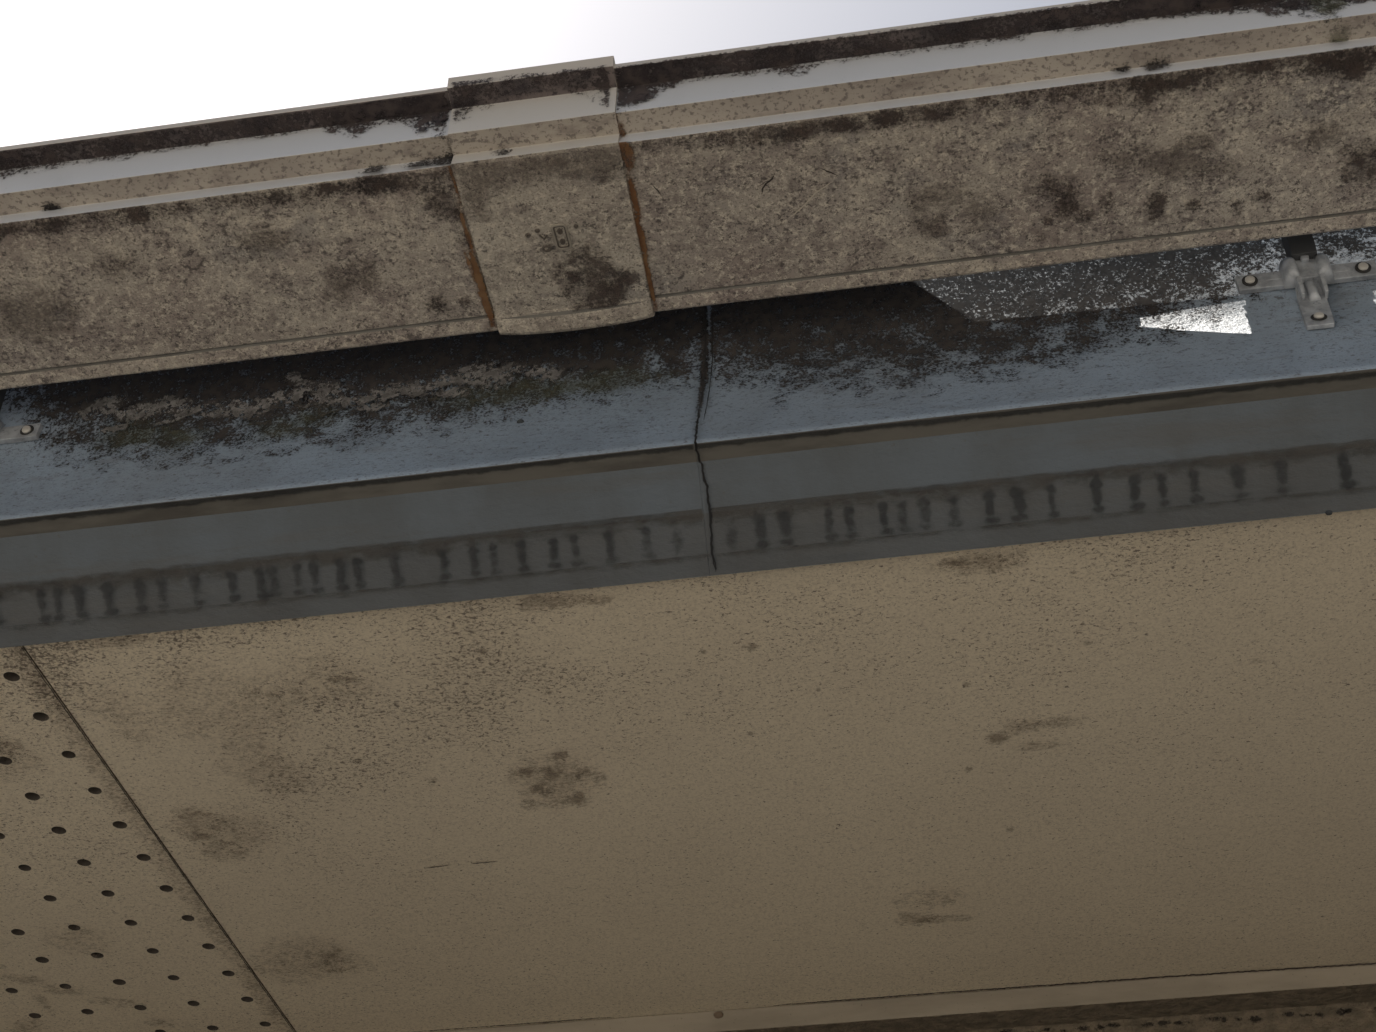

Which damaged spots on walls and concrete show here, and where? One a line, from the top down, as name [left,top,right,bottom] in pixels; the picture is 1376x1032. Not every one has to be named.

rust [448,165,495,327]
rust [619,141,657,310]
water stain [3,238,1287,476]
water stain [0,0,1376,247]
crack [694,306,717,571]
water stain [1312,226,1376,264]